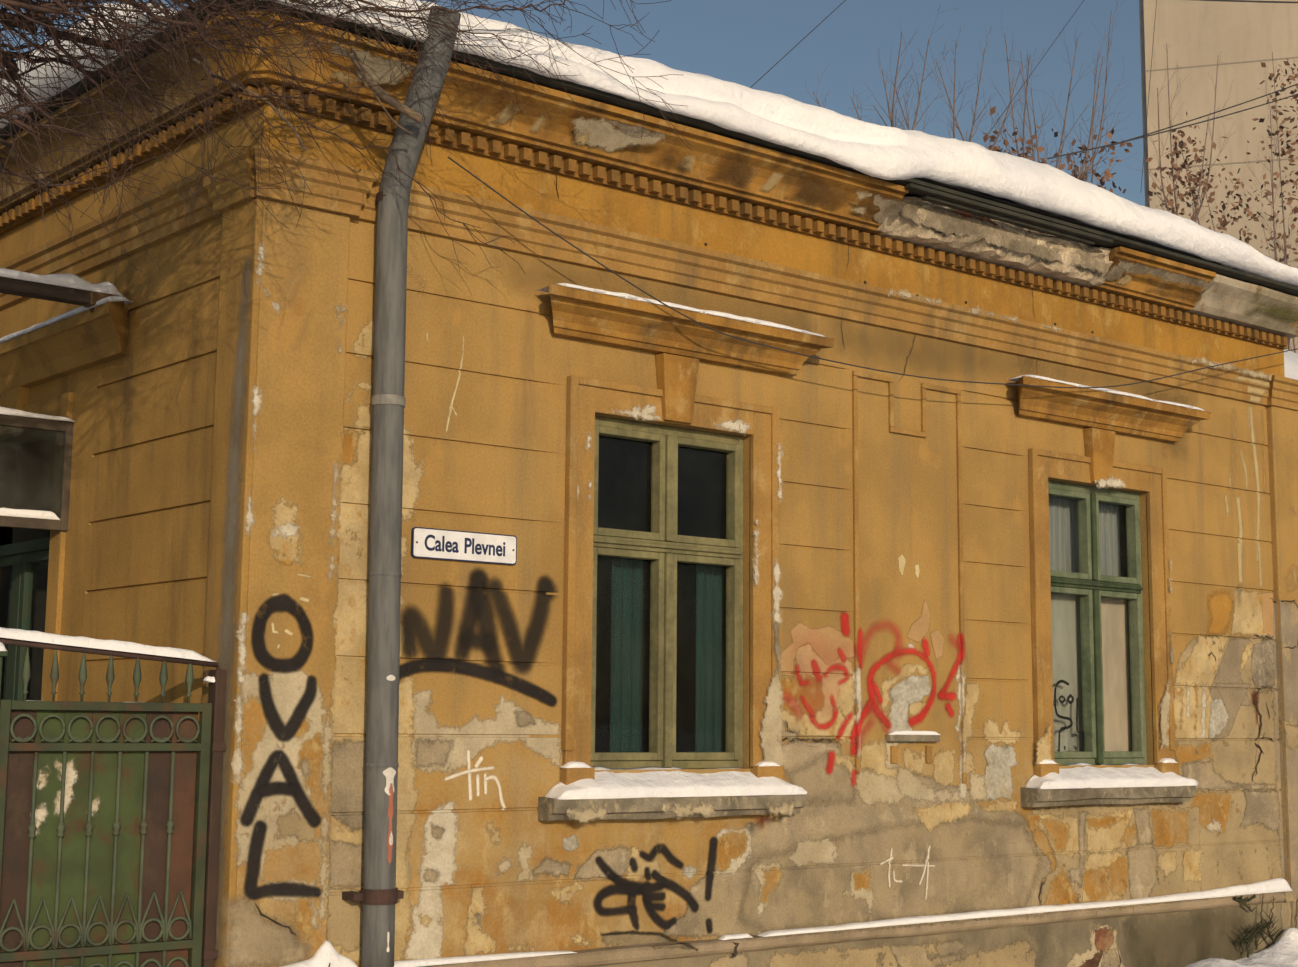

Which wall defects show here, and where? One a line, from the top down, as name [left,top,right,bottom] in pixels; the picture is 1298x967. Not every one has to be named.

spalling [572,118,665,152]
spalling [851,192,1214,290]
peeling [338,321,374,360]
peeling [888,290,942,303]
peeling [615,405,660,421]
peeling [716,419,751,434]
peeling [401,423,425,580]
peeling [1095,477,1125,488]
peeling [225,382,373,967]
spalling [661,520,1298,967]
flaking render [394,677,562,961]
flaking render [486,803,661,904]